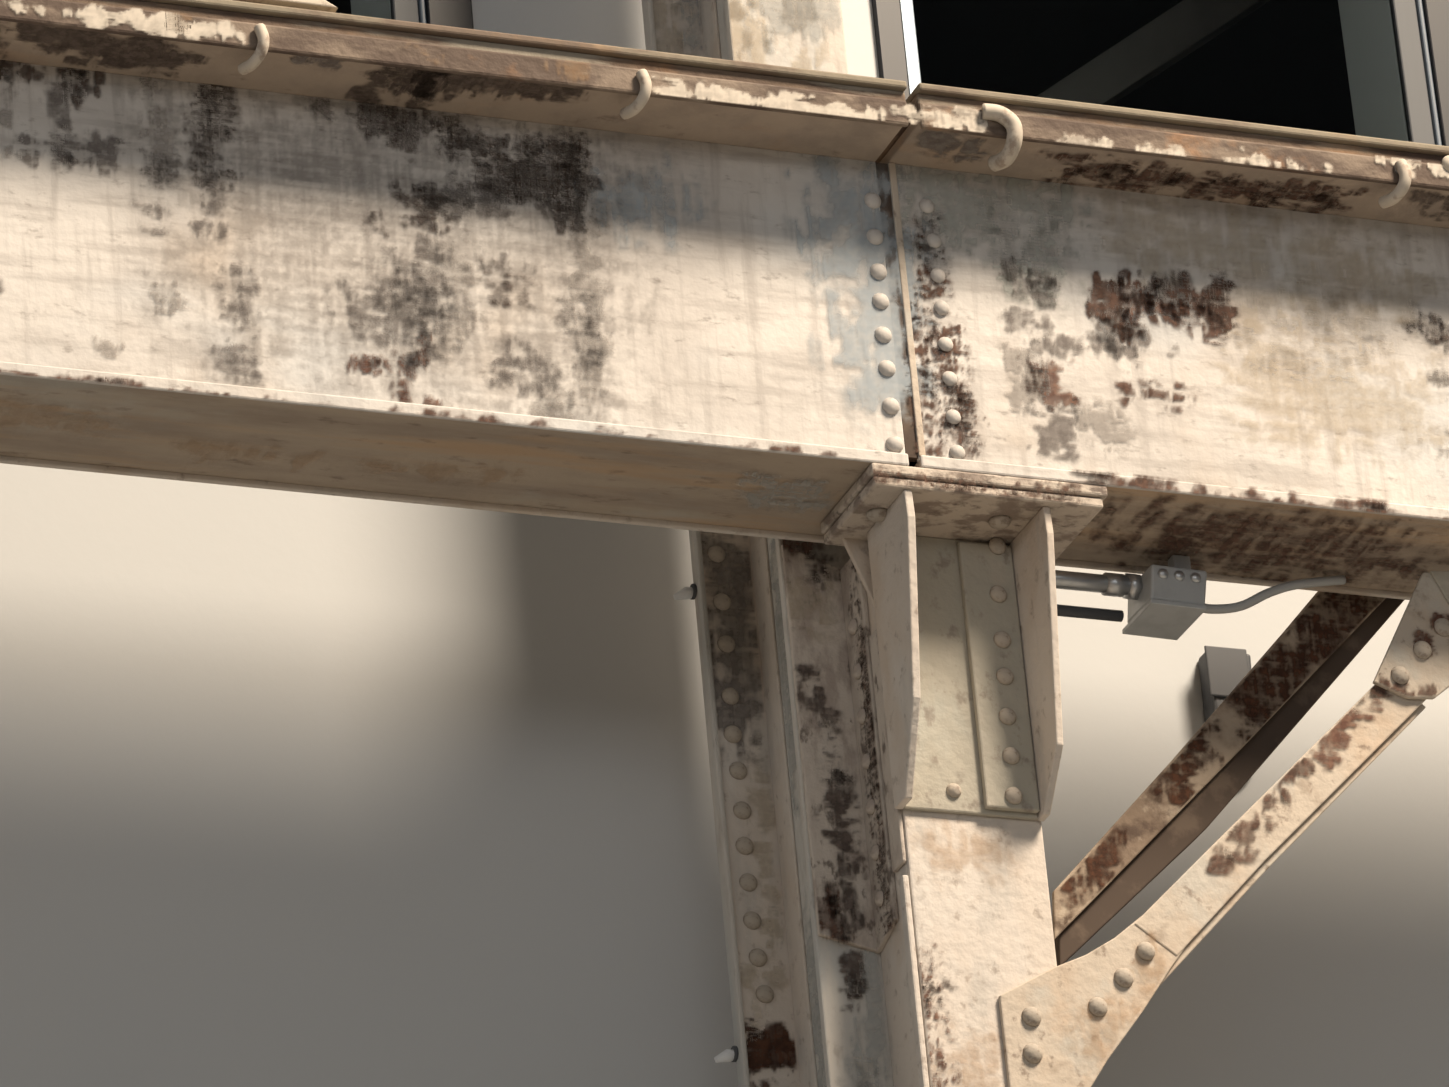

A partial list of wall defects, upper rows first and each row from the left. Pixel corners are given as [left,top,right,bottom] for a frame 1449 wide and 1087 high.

peeling [1375,156,1449,178]
leakage [212,327,262,383]
leakage [394,233,483,365]
leakage [569,215,609,400]
rust [904,212,986,457]
peeling [1406,313,1449,347]
rust [1230,592,1376,741]
rust [1150,724,1224,806]
rust [1207,673,1437,874]
rust [1061,829,1127,923]
rust [744,1018,796,1087]
peeling [920,962,961,1087]